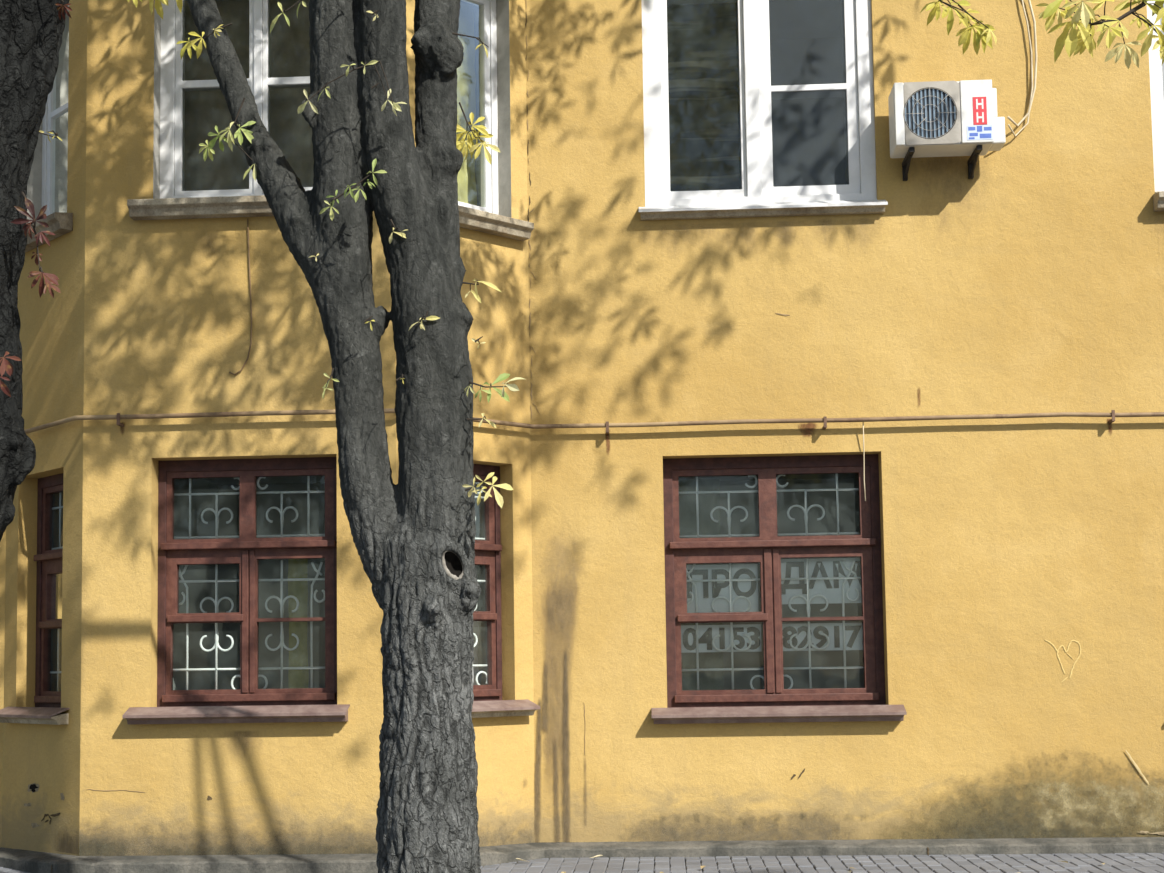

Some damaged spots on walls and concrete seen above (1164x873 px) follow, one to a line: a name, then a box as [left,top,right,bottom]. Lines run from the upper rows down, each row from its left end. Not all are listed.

damp [479,591,573,847]
damp [889,772,1164,839]